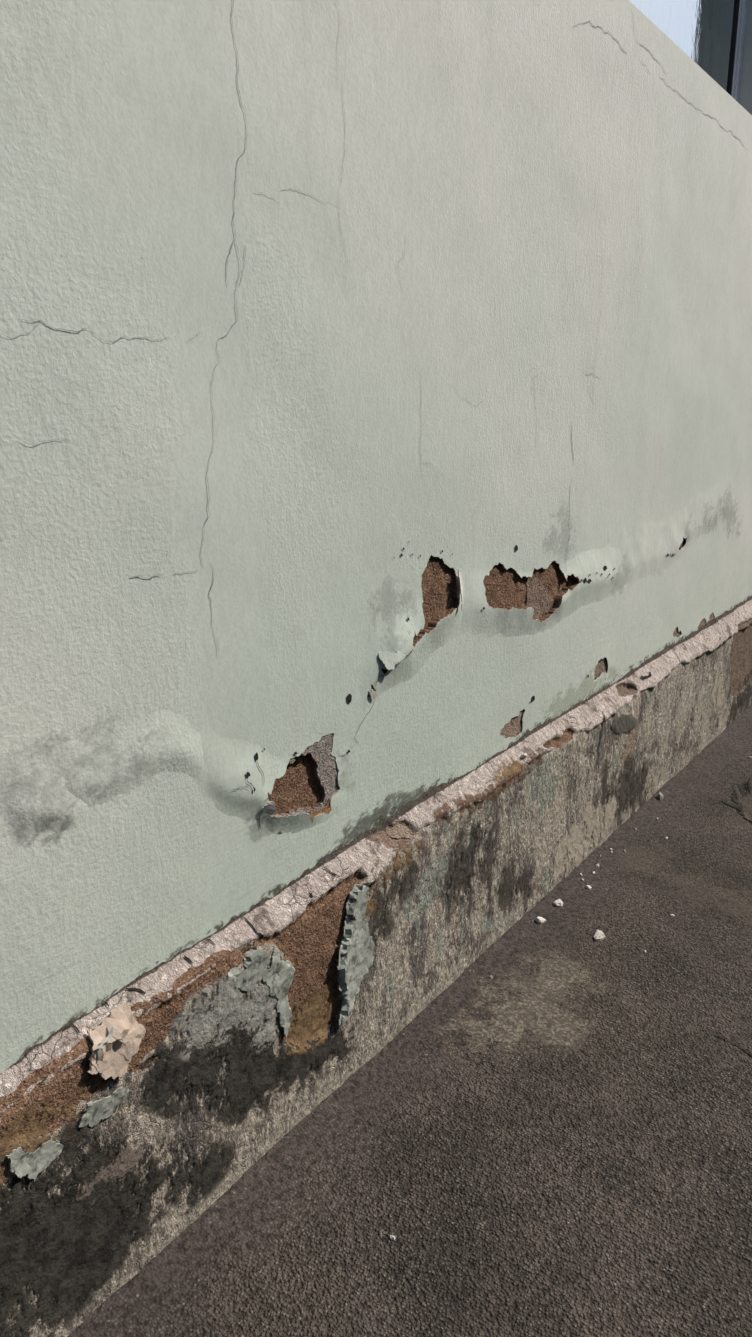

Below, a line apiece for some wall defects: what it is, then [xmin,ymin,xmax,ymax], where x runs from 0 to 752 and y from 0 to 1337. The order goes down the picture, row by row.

crack [574,13,747,149]
crack [0,0,348,657]
spalling [367,555,463,699]
spalling [483,561,580,622]
spalling [588,657,608,680]
spalling [500,696,535,738]
spalling [262,733,340,822]
spalling [0,872,374,1182]
peeling [72,1144,143,1202]